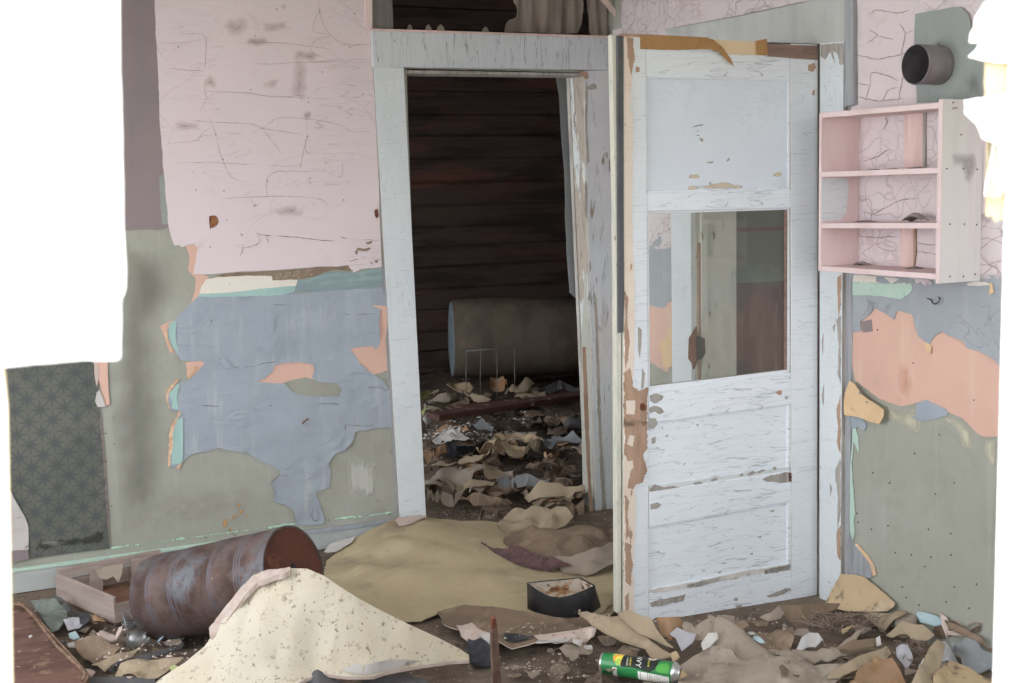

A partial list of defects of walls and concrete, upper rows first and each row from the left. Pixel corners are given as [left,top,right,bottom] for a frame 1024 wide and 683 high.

crack [161,1,369,204]
crack [857,9,911,161]
peeling [119,0,391,526]
crack [240,233,378,261]
peeling [612,0,811,612]
crack [861,198,936,255]
peeling [830,0,1004,579]